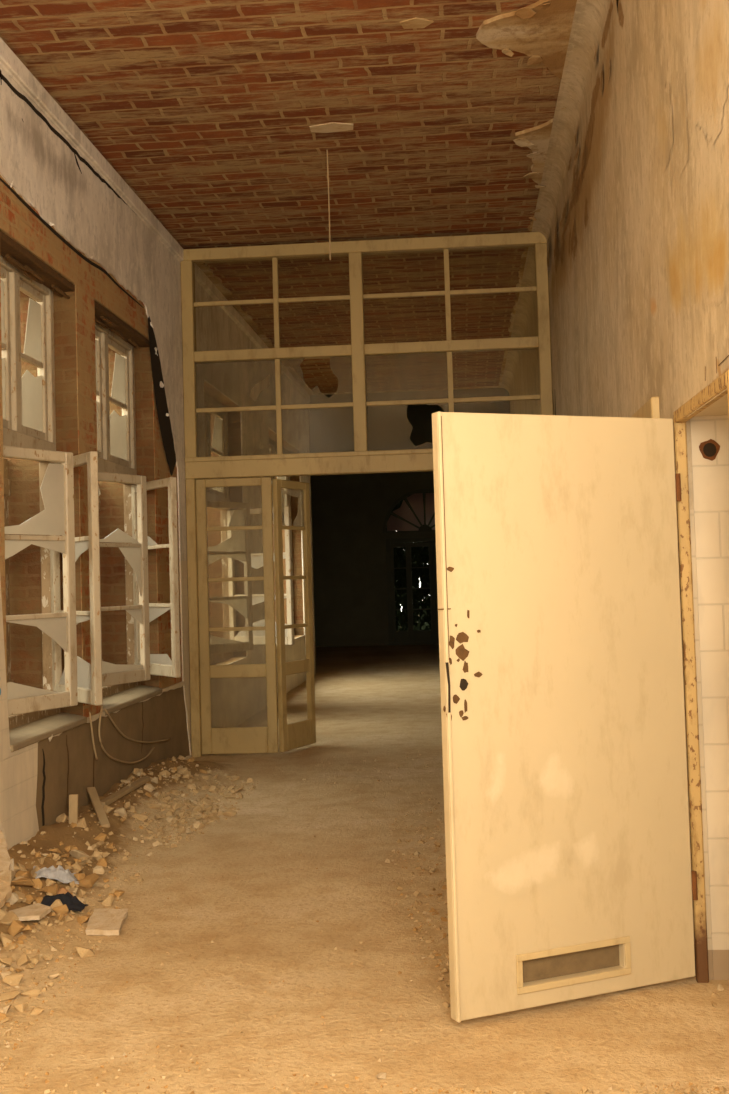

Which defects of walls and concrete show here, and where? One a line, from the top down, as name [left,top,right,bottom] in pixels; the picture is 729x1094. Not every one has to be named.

crack [0,70,134,212]
flaking render [0,0,565,249]
peeling [547,0,624,313]
flaking render [206,256,353,393]
flaking render [362,247,525,391]
water stain [663,176,729,325]
peeling [0,175,190,830]
spalling [699,439,720,461]